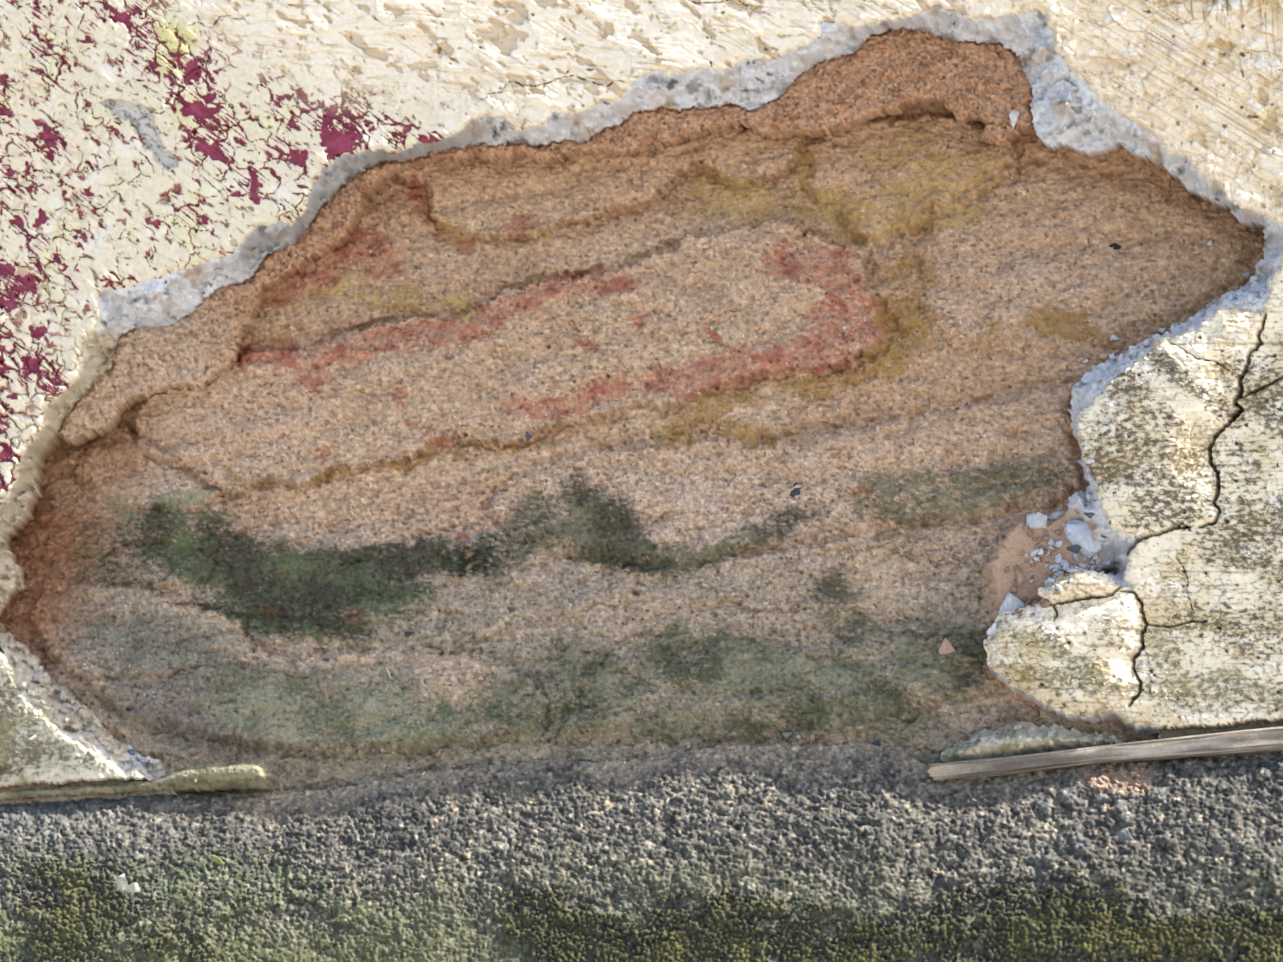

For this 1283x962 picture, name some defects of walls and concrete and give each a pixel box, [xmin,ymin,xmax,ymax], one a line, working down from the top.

peeling [30,0,71,85]
peeling [0,75,67,162]
peeling [0,159,76,312]
peeling [60,179,104,247]
spalling [85,99,182,171]
peeling [100,0,263,171]
peeling [227,166,262,204]
peeling [266,137,308,179]
peeling [0,343,19,380]
peeling [29,326,47,340]
peeling [0,394,17,434]
spalling [0,779,136,791]